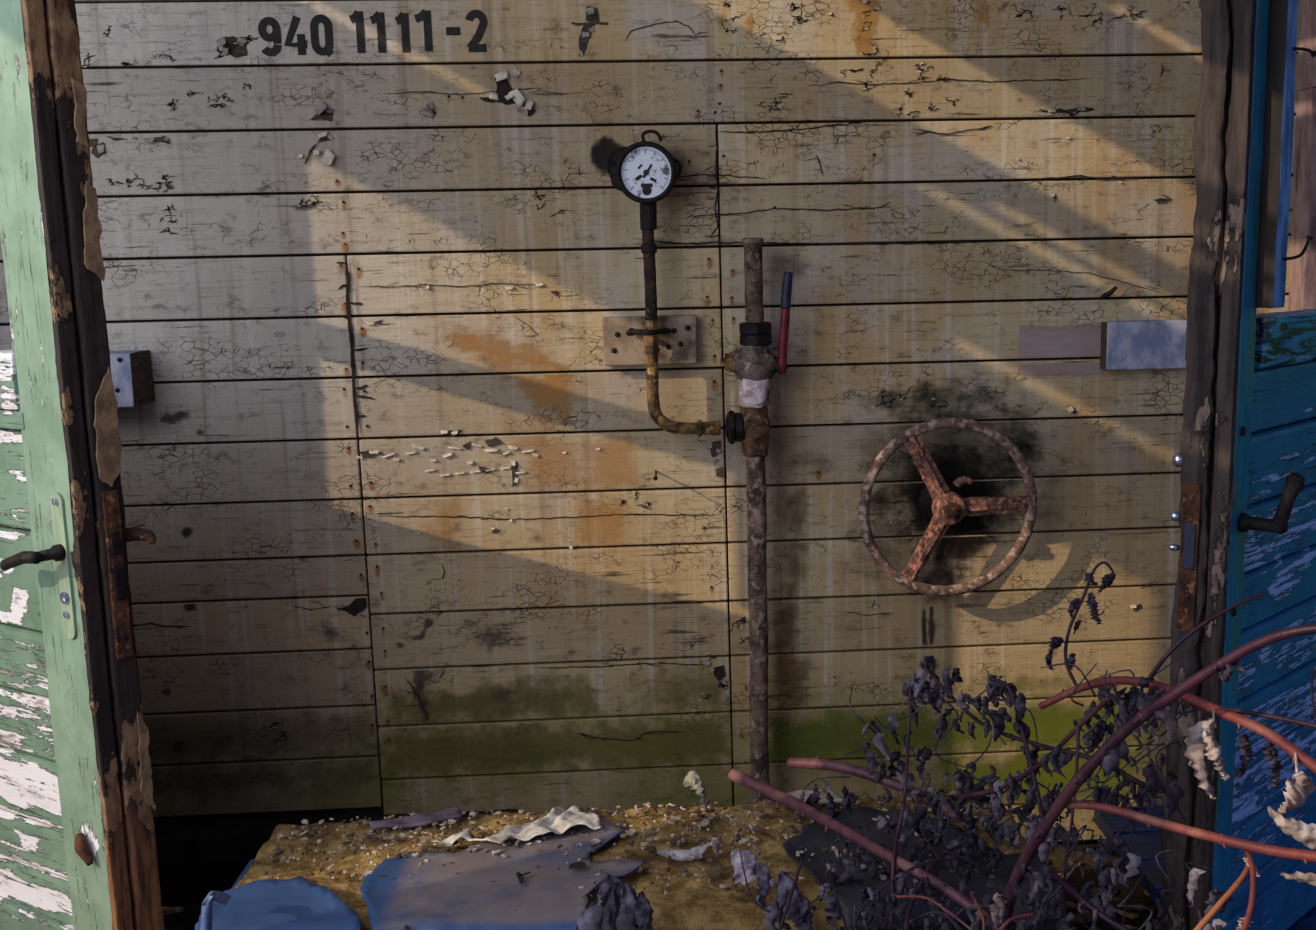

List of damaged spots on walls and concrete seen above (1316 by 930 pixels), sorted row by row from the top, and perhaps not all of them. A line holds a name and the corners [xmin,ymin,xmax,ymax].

crack [383,87,541,95]
crack [633,2,1172,294]
peeling [83,181,106,281]
crack [533,190,573,217]
corrosion [453,333,570,418]
leakage [920,606,936,688]